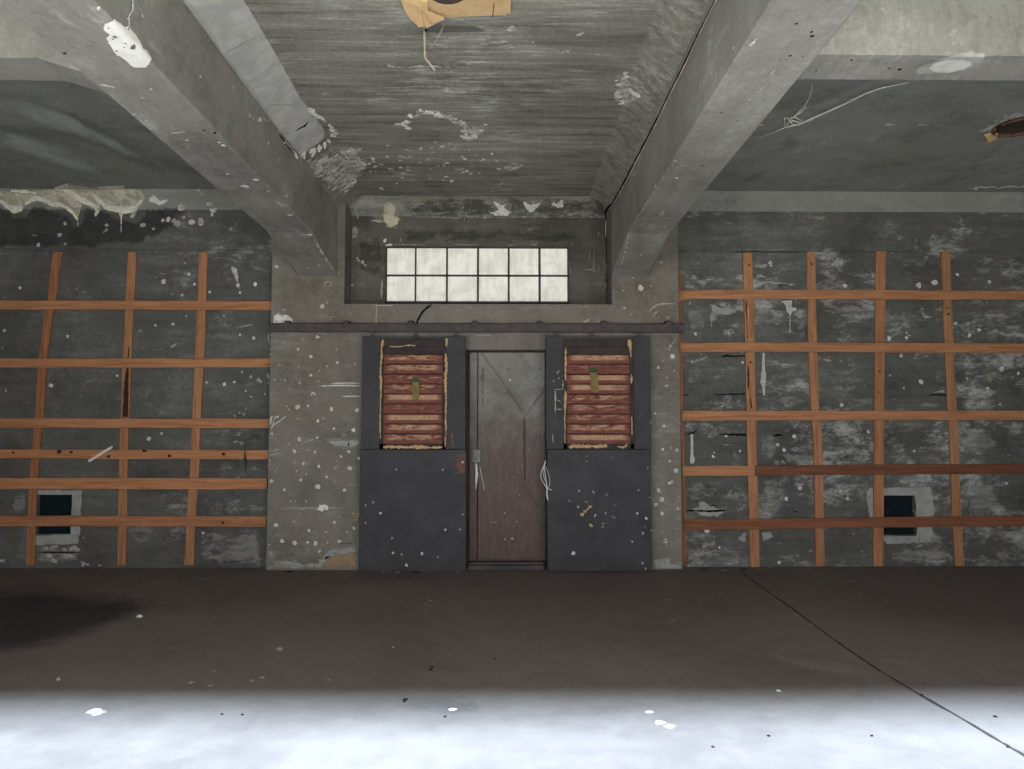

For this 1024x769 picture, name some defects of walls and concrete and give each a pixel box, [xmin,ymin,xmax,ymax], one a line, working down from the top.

spalling [104,19,152,68]
damp [0,96,208,250]
peeling [268,108,501,194]
damp [357,163,607,276]
damp [782,300,797,332]